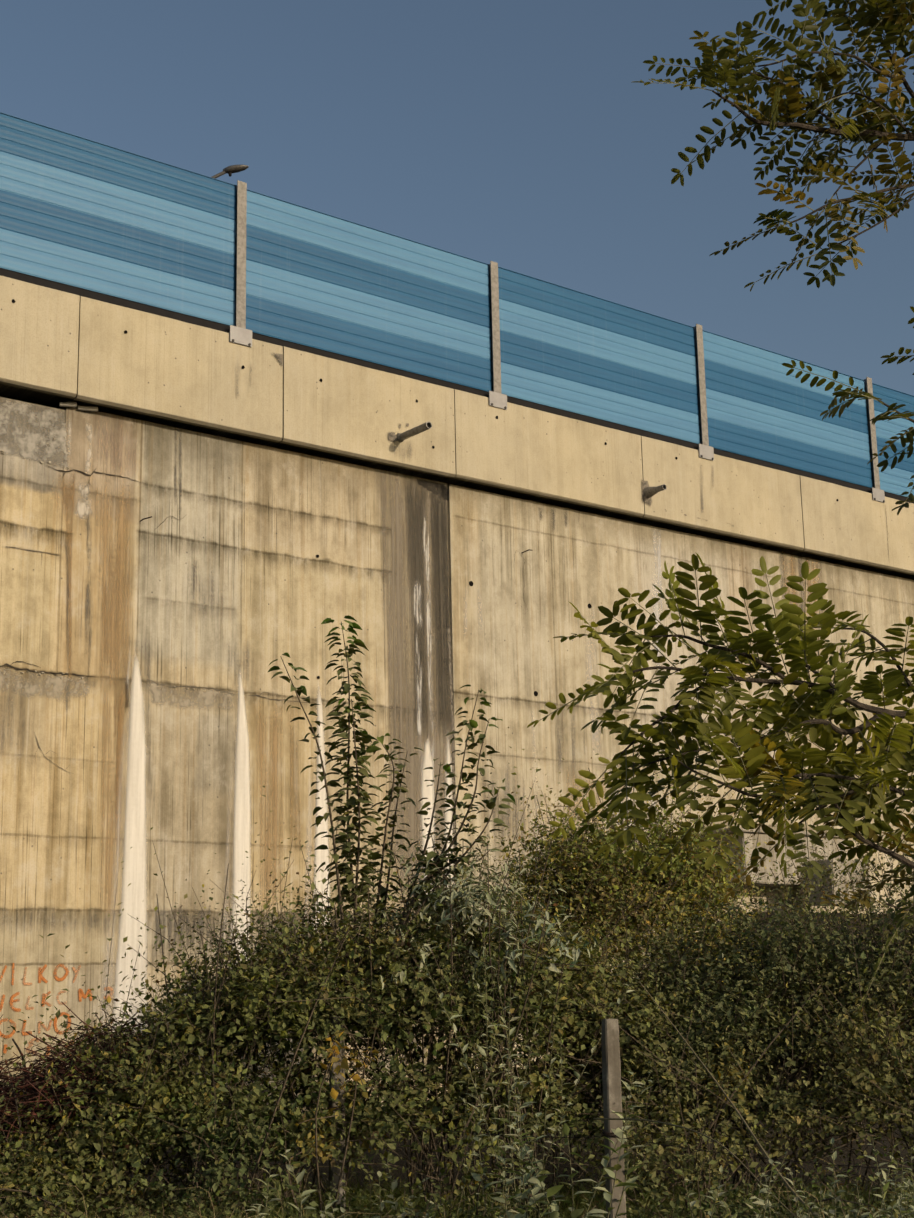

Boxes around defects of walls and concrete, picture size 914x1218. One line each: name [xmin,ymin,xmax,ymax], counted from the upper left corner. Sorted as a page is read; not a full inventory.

peeling [0,400,71,469]
peeling [77,486,89,517]
crack [0,546,93,677]
water stain [381,475,453,908]
water stain [105,646,331,1032]